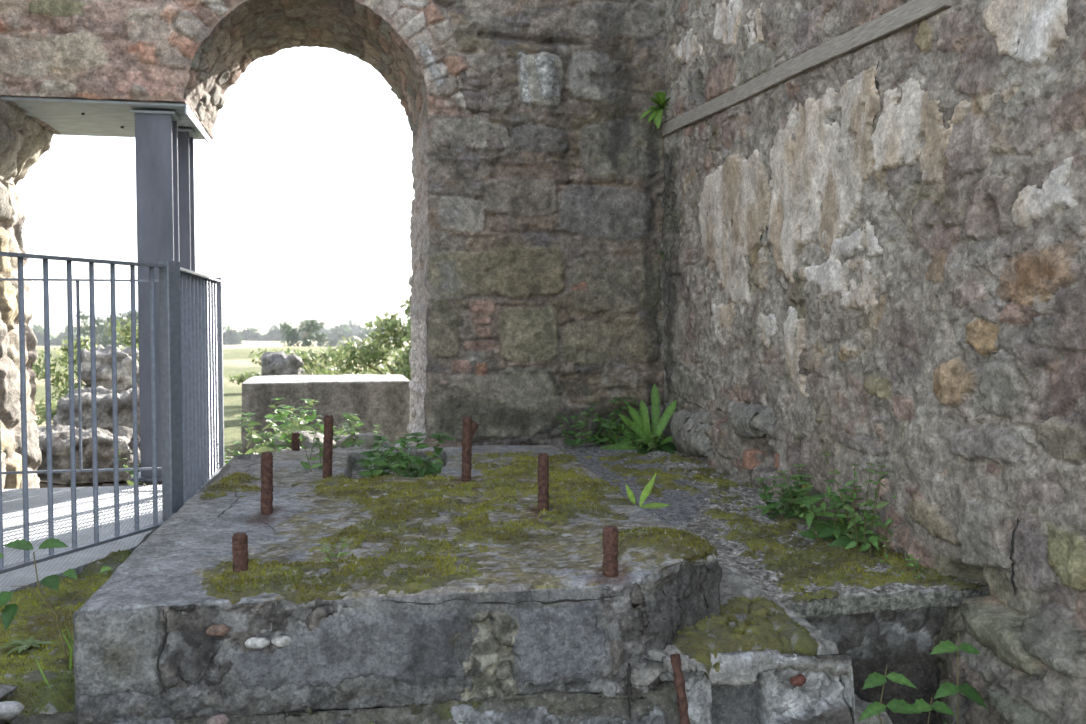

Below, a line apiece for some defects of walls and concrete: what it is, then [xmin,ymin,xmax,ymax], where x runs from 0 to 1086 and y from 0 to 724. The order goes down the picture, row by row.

peeling [982,0,1069,68]
peeling [697,65,971,399]
peeling [1012,157,1078,229]
crack [1009,515,1020,596]